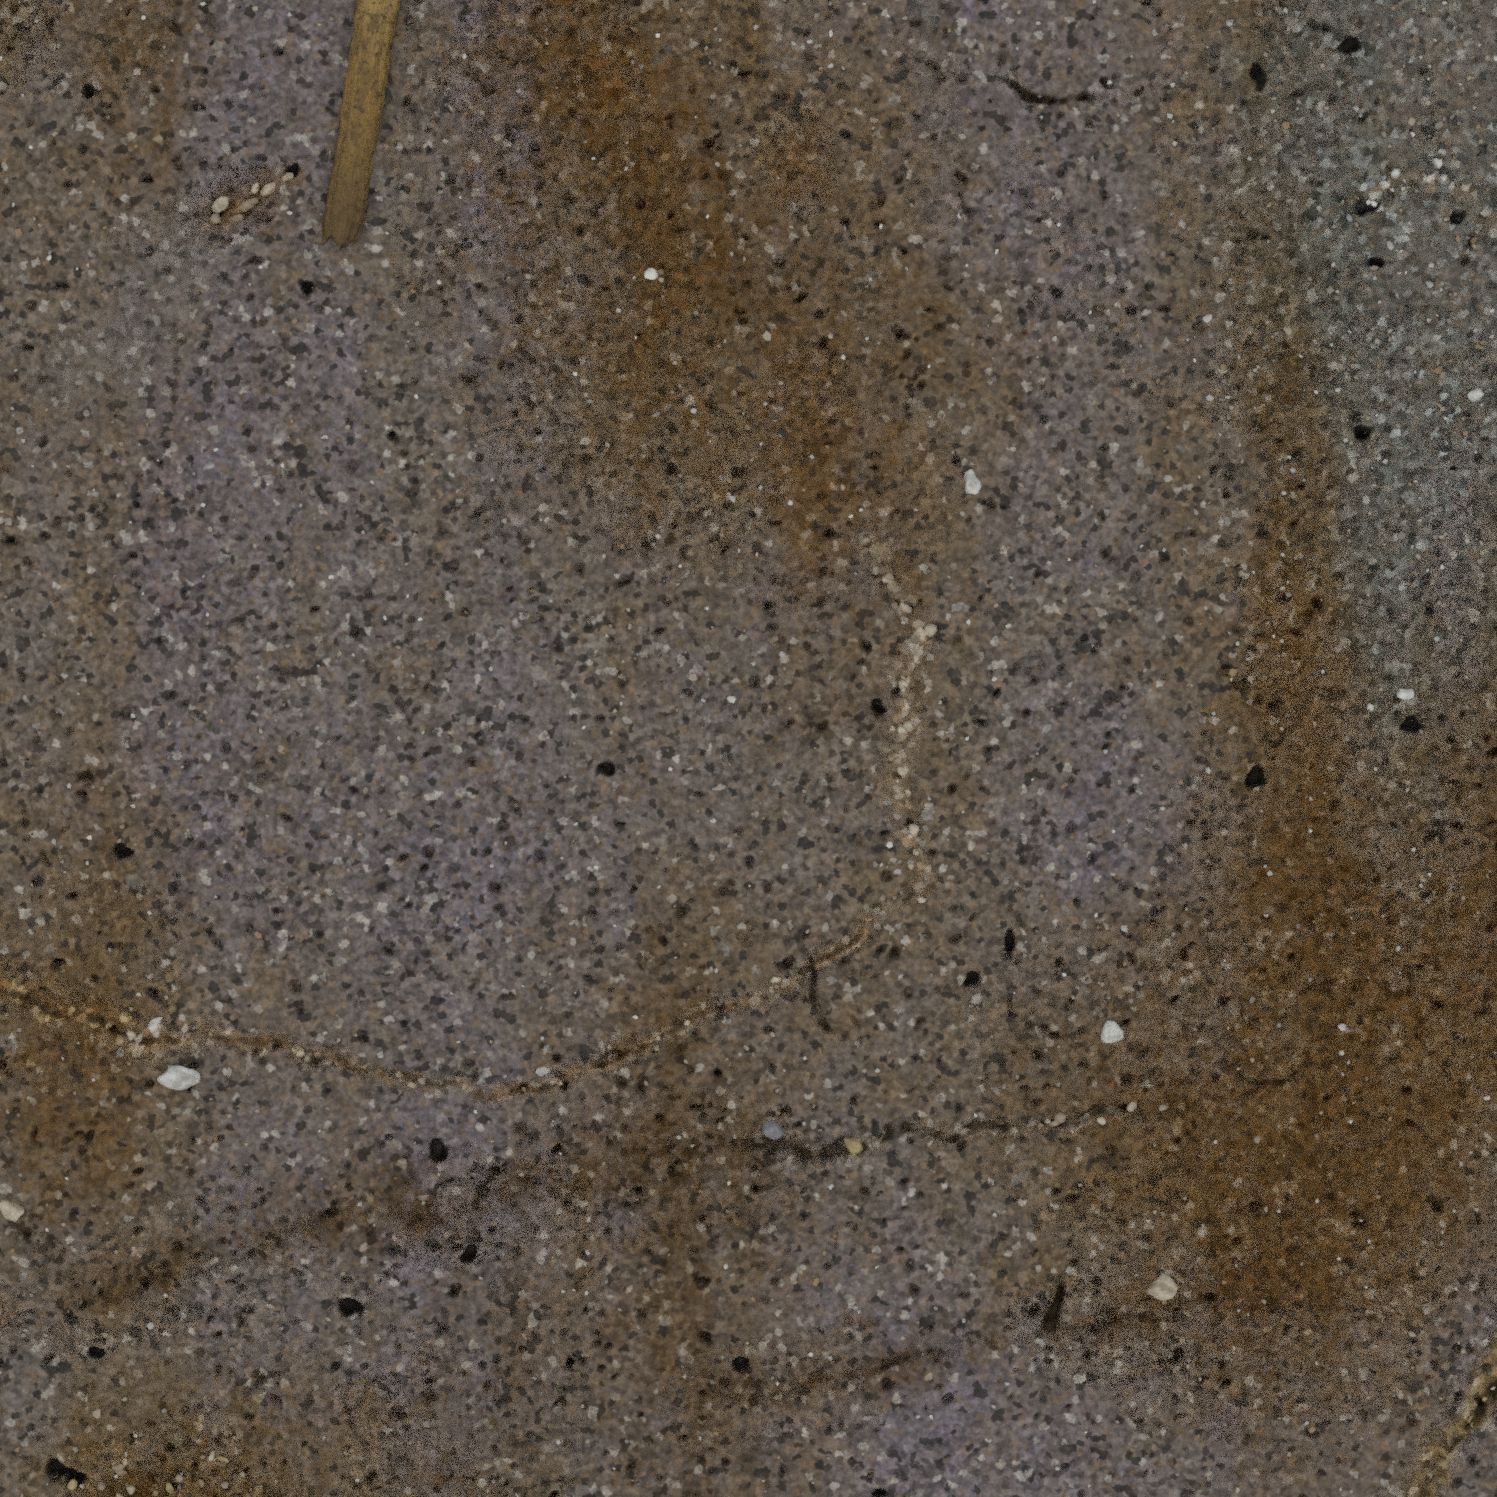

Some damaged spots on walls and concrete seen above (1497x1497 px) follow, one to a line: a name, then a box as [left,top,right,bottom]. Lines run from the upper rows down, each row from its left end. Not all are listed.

crack [0,530,938,1101]
crack [1406,1338,1497,1497]